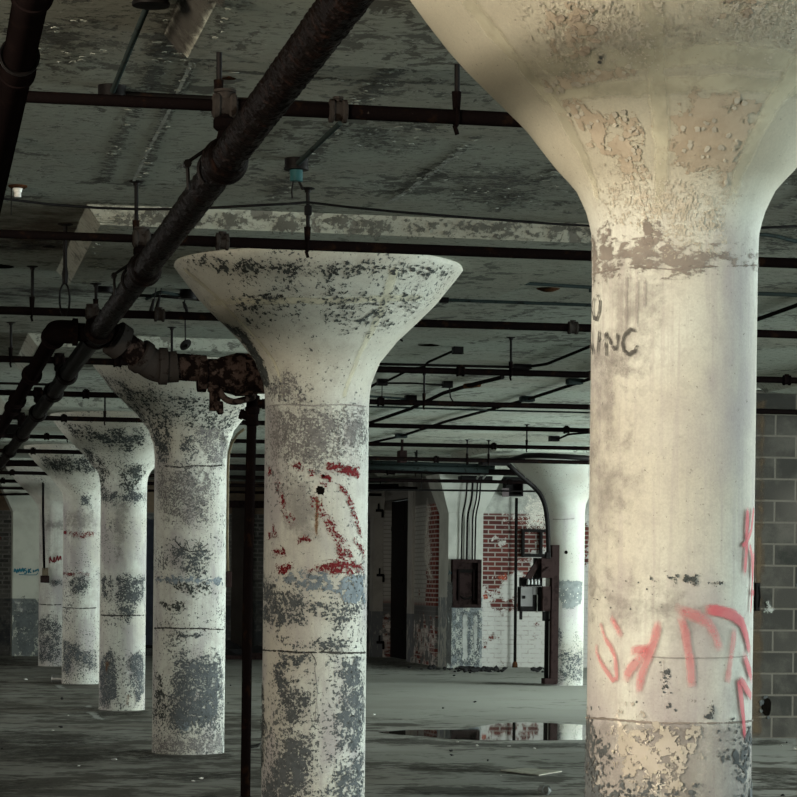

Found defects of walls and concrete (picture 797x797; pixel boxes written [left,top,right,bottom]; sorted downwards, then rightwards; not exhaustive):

peeling [557,96,653,181]
peeling [667,86,766,188]
peeling [181,252,454,538]
peeling [40,373,237,612]
peeling [49,571,145,624]
peeling [446,580,488,667]
peeling [260,567,366,797]
peeling [583,702,715,797]
peeling [717,717,753,797]
spalling [759,695,771,719]